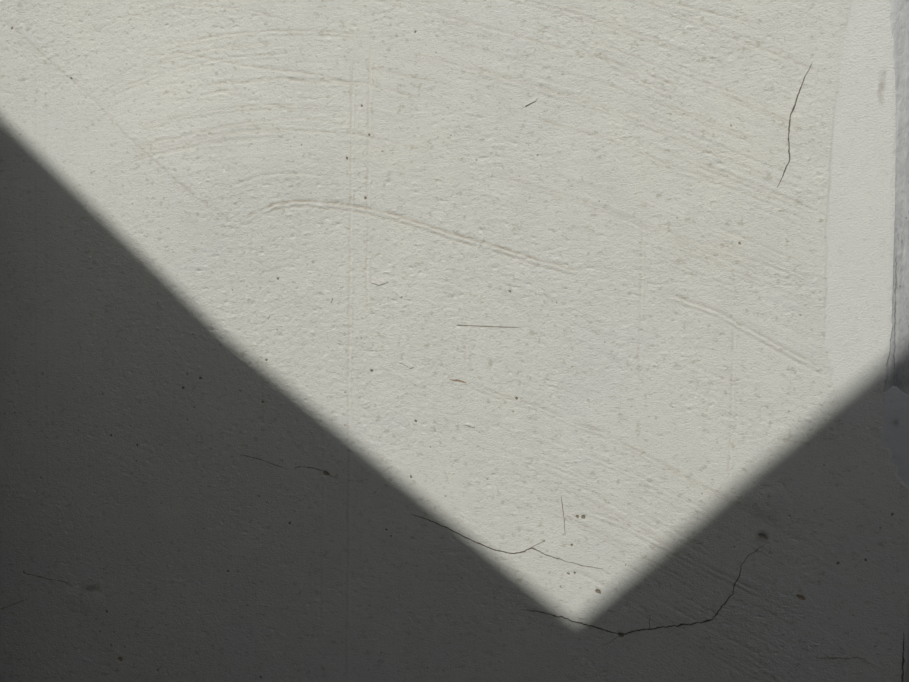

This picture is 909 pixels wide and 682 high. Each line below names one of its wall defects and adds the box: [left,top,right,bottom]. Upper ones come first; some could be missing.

crack [777,62,813,187]
crack [410,514,602,569]
crack [528,546,763,645]